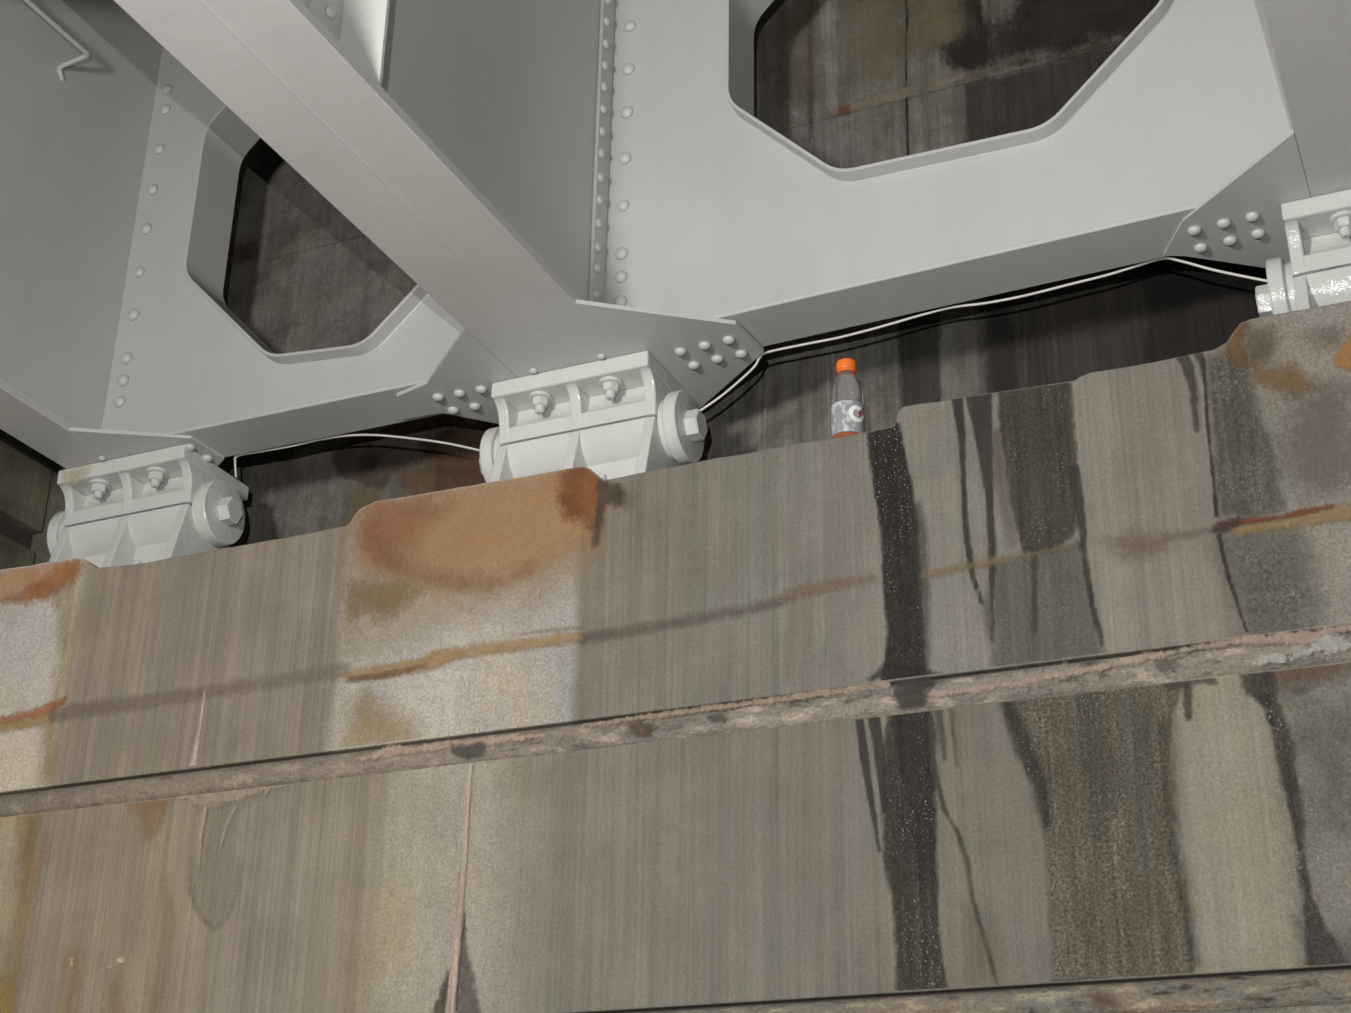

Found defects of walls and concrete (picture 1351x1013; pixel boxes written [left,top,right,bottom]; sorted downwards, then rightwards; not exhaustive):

rust [1228,323,1311,391]
rust [1334,338,1351,369]
rust [349,421,600,581]
leakage [898,256,1281,665]
rust [1212,504,1351,534]
rust [0,561,77,601]
leakage [1233,536,1306,628]
rust [344,633,578,680]
rust [0,697,67,737]
leakage [855,423,995,990]
leakage [1001,678,1217,981]
crack [434,763,479,1013]